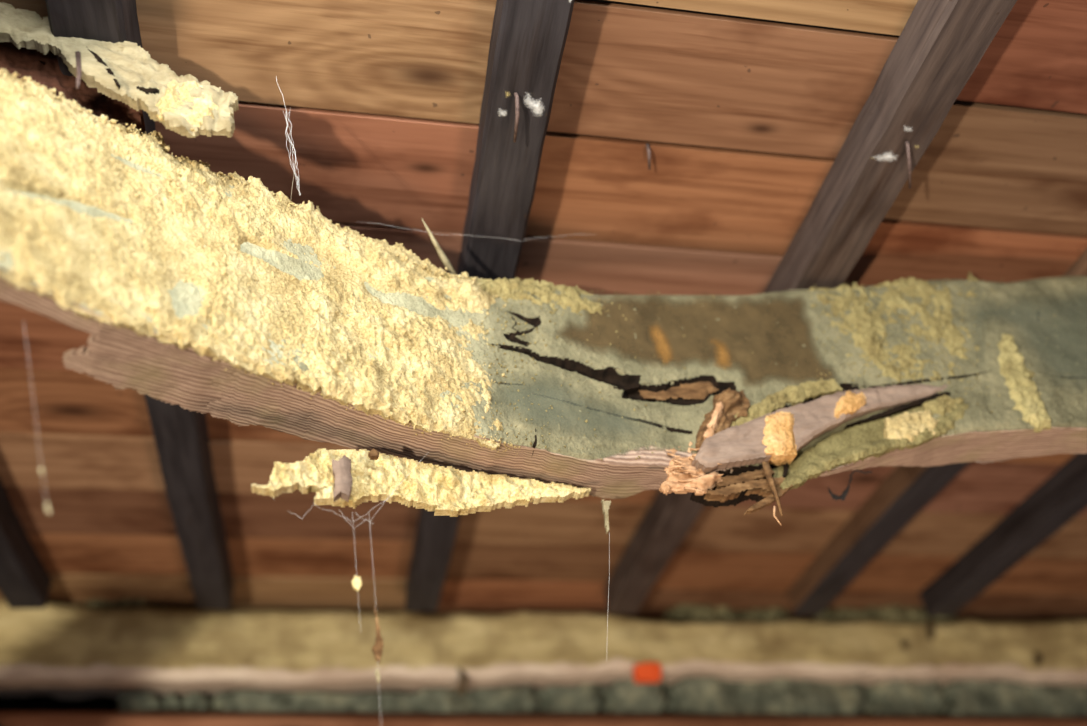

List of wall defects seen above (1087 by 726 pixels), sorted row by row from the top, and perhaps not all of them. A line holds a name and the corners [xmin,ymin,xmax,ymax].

damp [561,297,833,383]
damp [507,387,633,430]
crack [492,311,736,434]
crack [773,370,991,429]
crack [690,462,788,507]